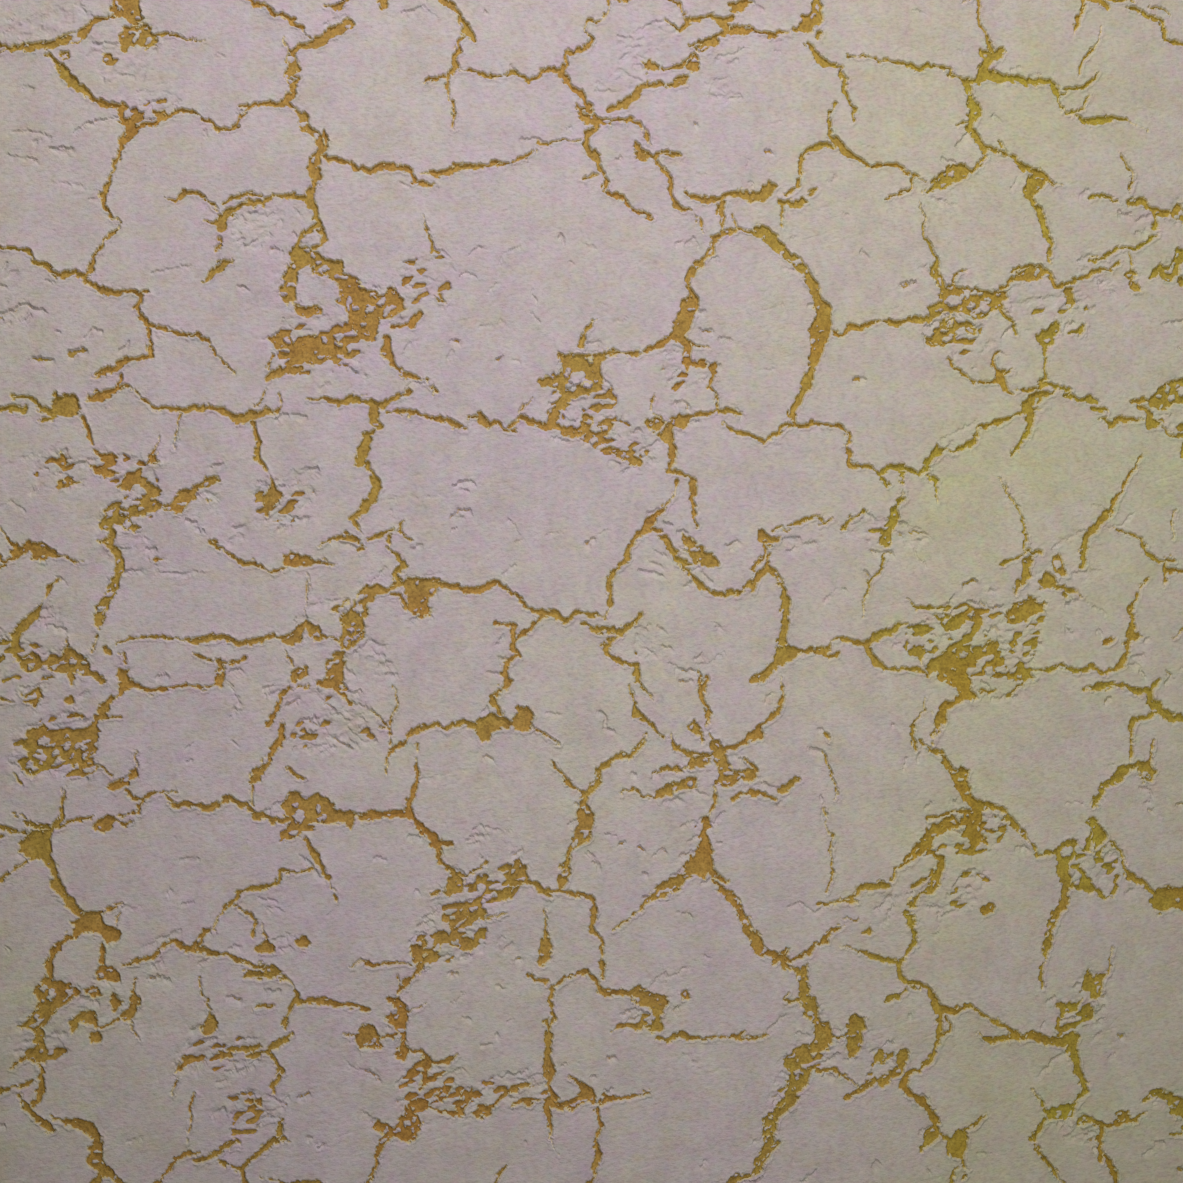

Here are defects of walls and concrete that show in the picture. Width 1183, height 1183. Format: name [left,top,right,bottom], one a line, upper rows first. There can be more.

spalling [226,214,502,548]
crack [0,0,1183,689]
spalling [536,317,745,530]
spalling [898,150,1183,359]
spalling [0,413,243,787]
crack [0,1078,322,1183]
spalling [342,823,555,1183]
crack [0,614,1092,1106]
crack [525,972,651,1183]
spalling [548,956,954,1183]
crack [897,1075,988,1183]
crack [891,453,1183,990]